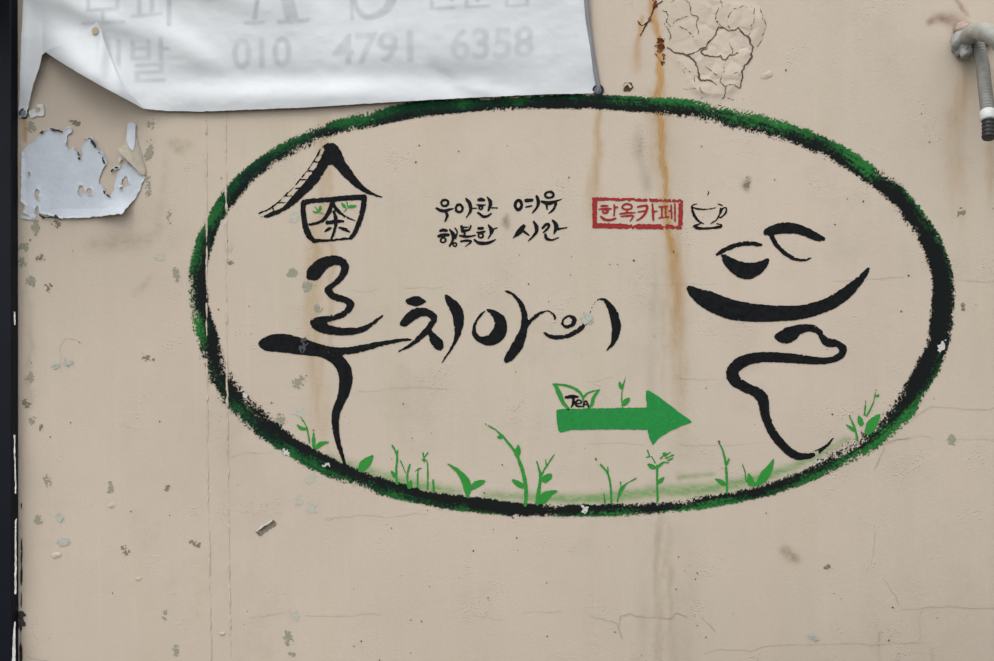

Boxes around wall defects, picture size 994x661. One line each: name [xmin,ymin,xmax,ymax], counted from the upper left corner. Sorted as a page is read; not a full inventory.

corrosion [648,0,666,98]
peeling [18,119,155,293]
corrosion [656,111,674,254]